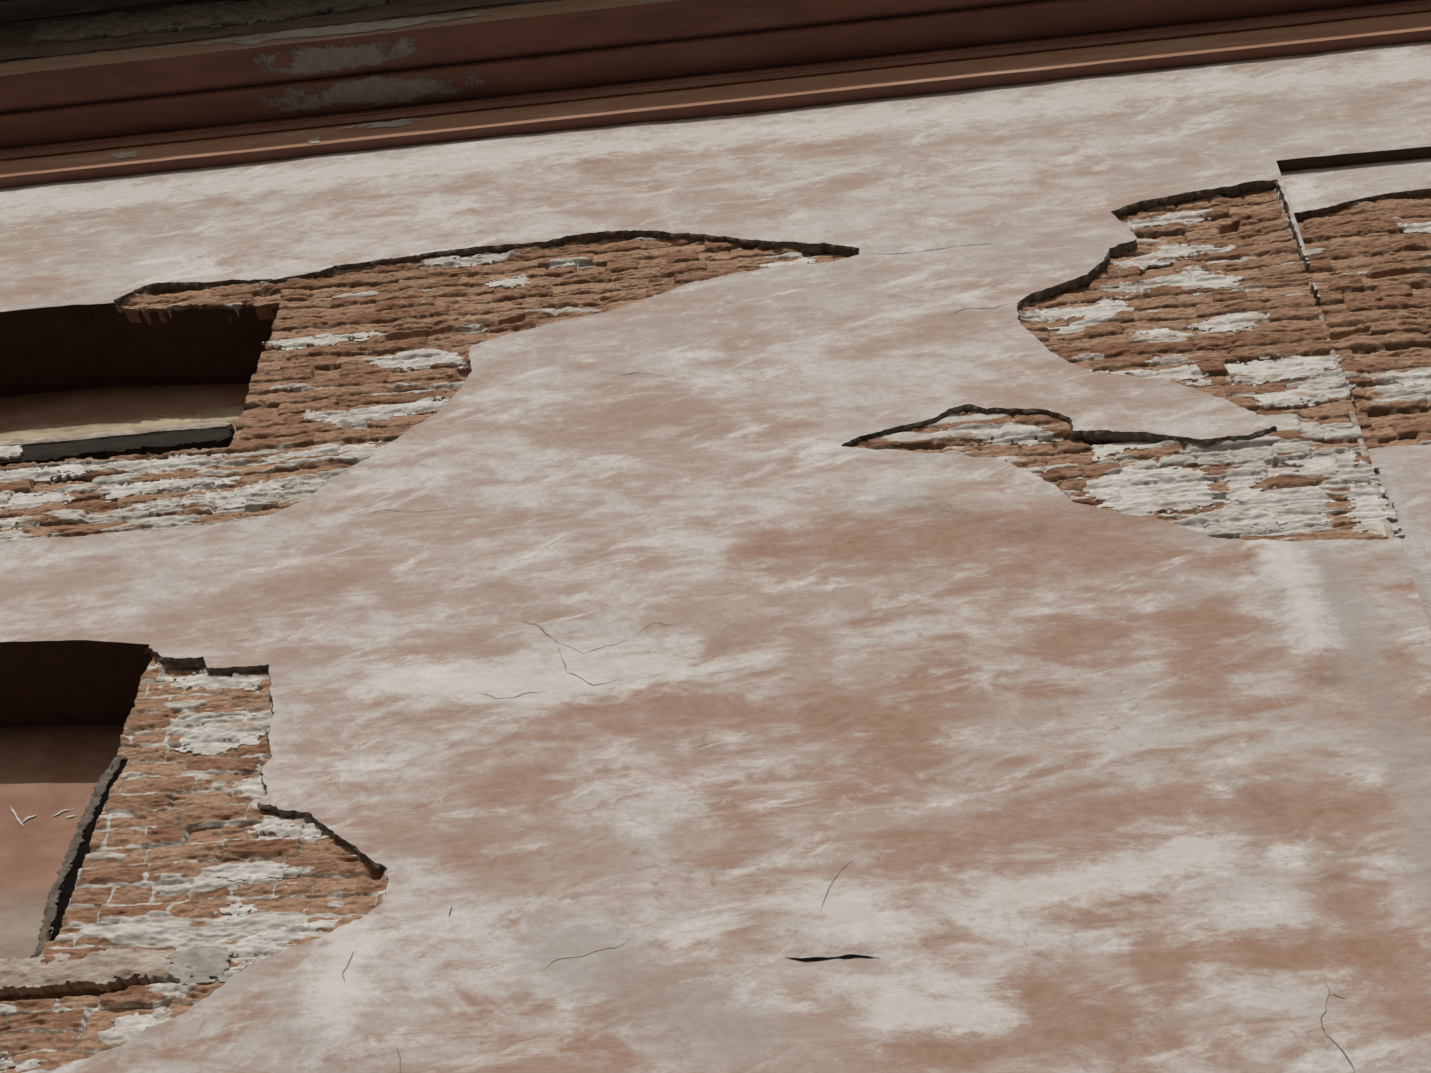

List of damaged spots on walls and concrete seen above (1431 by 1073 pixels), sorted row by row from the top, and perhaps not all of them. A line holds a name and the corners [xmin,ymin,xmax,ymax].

spalling [0,230,859,541]
spalling [841,179,1431,542]
spalling [0,648,389,1073]
crack [787,953,879,961]